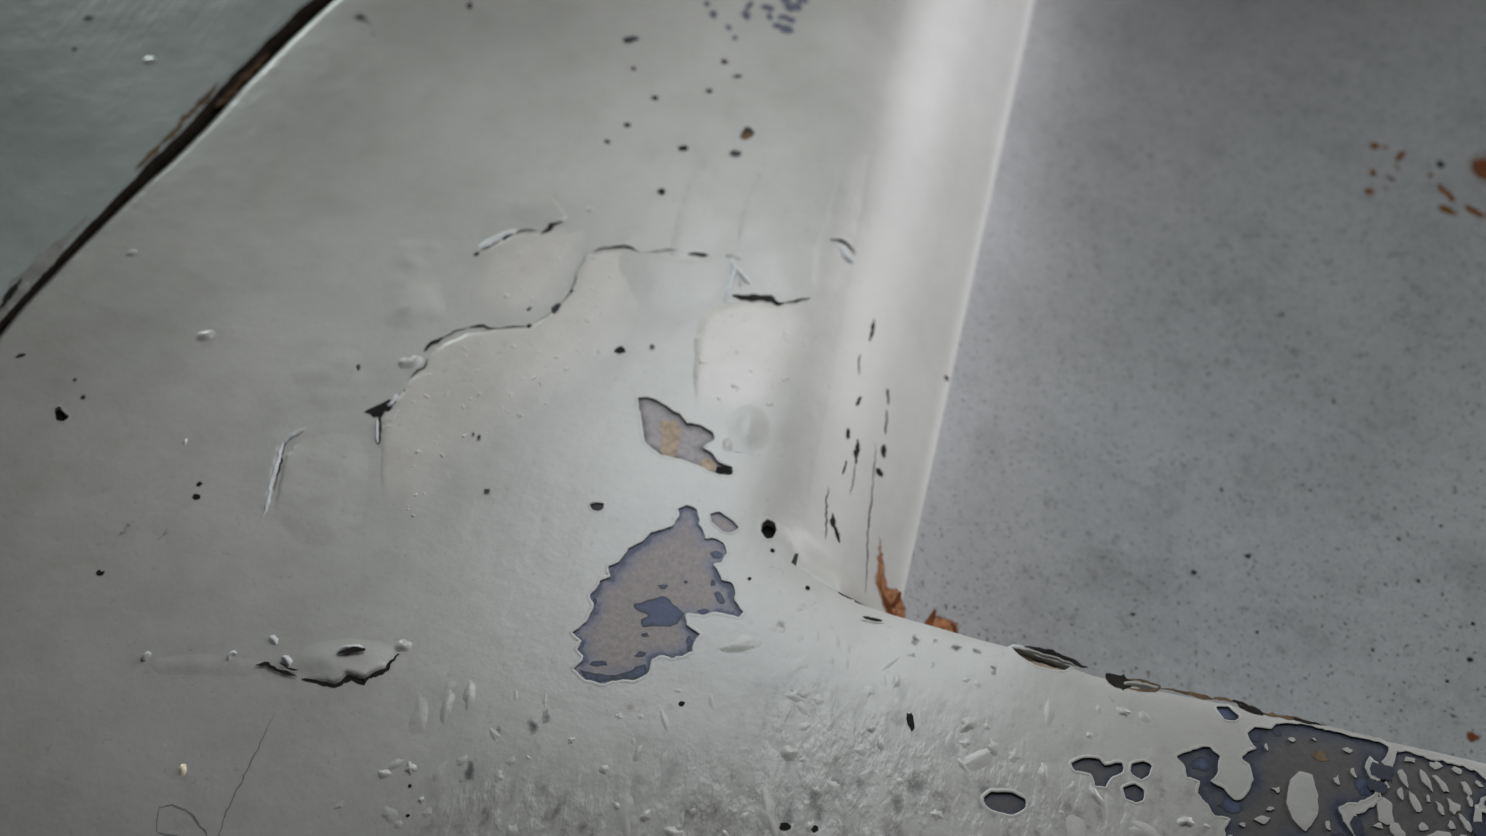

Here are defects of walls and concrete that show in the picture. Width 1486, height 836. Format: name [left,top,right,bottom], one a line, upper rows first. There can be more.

corrosion [1428,173,1484,217]
corrosion [1472,159,1486,178]
crack [0,278,22,309]
peeling [634,394,737,478]
peeling [569,502,777,687]
corrosion [876,546,905,618]
corrosion [925,606,958,633]
crack [140,651,151,662]
crack [226,635,399,688]
crack [156,714,275,836]
peeling [1068,755,1154,805]
peeling [1174,703,1486,836]